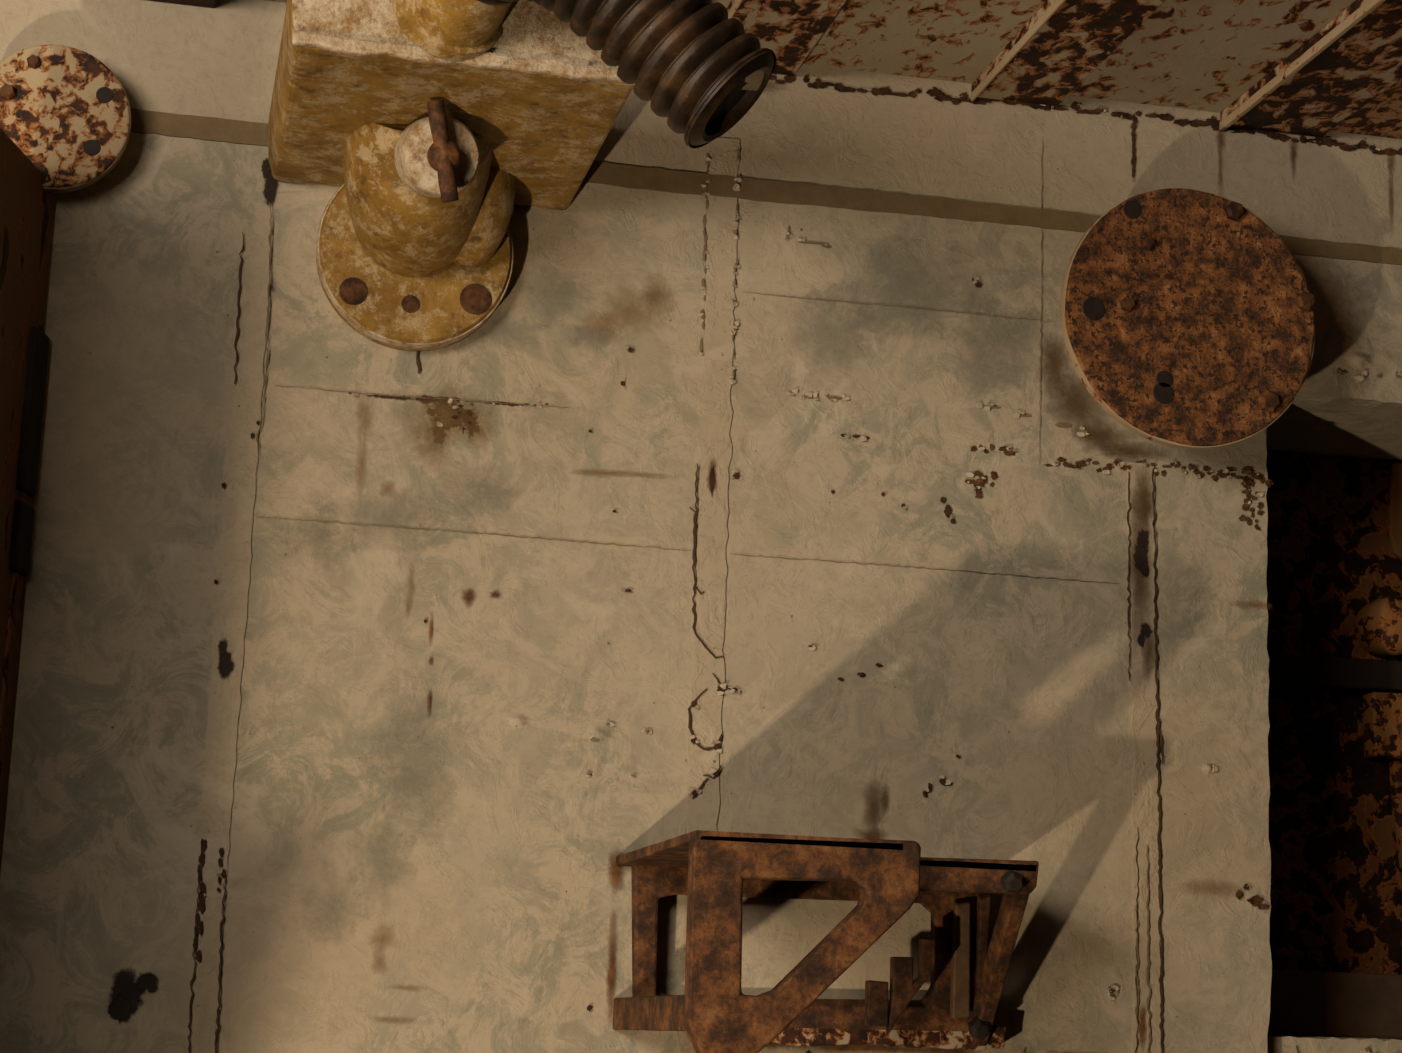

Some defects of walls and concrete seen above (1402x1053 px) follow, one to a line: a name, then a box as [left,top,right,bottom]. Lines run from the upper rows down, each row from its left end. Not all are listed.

rust [368,395,482,445]
crack [255,463,731,799]
crack [738,468,1164,1053]